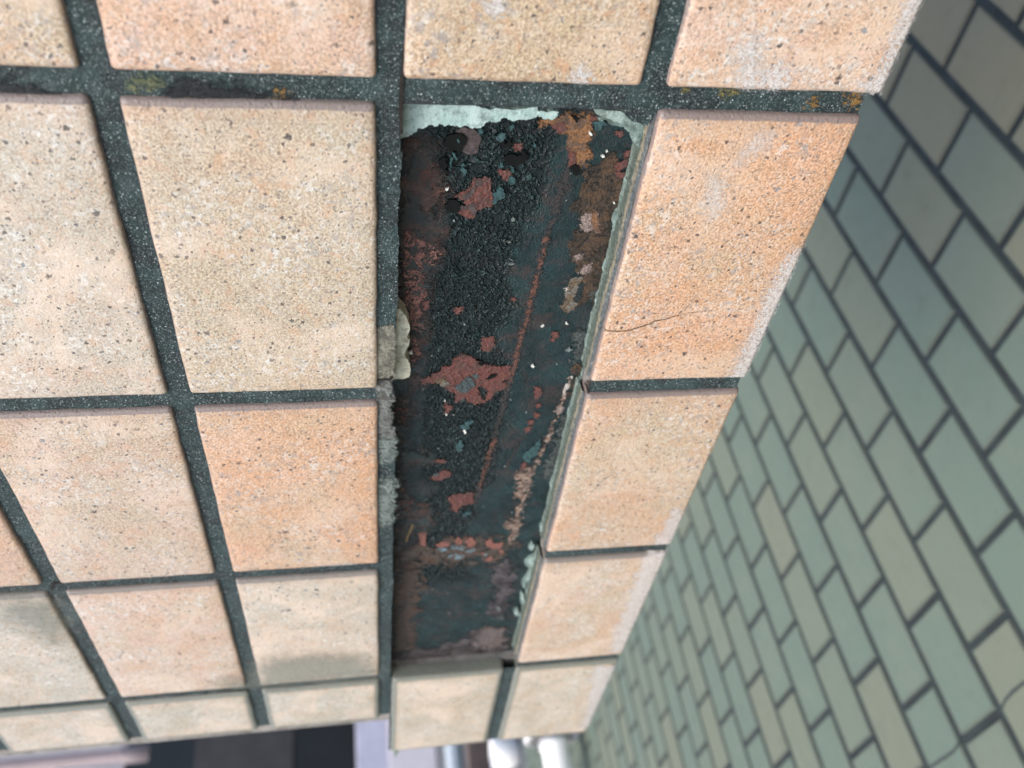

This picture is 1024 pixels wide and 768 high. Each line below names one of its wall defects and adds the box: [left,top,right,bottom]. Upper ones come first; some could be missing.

peeling [438,124,536,219]
peeling [550,114,623,138]
peeling [600,150,631,180]
rust [538,111,624,314]
crack [604,310,712,332]
peeling [373,325,400,528]
peeling [430,447,451,481]
peeling [455,418,474,452]
peeling [421,336,512,416]
rust [391,134,573,661]
peeling [520,386,542,470]
peeling [447,492,475,517]